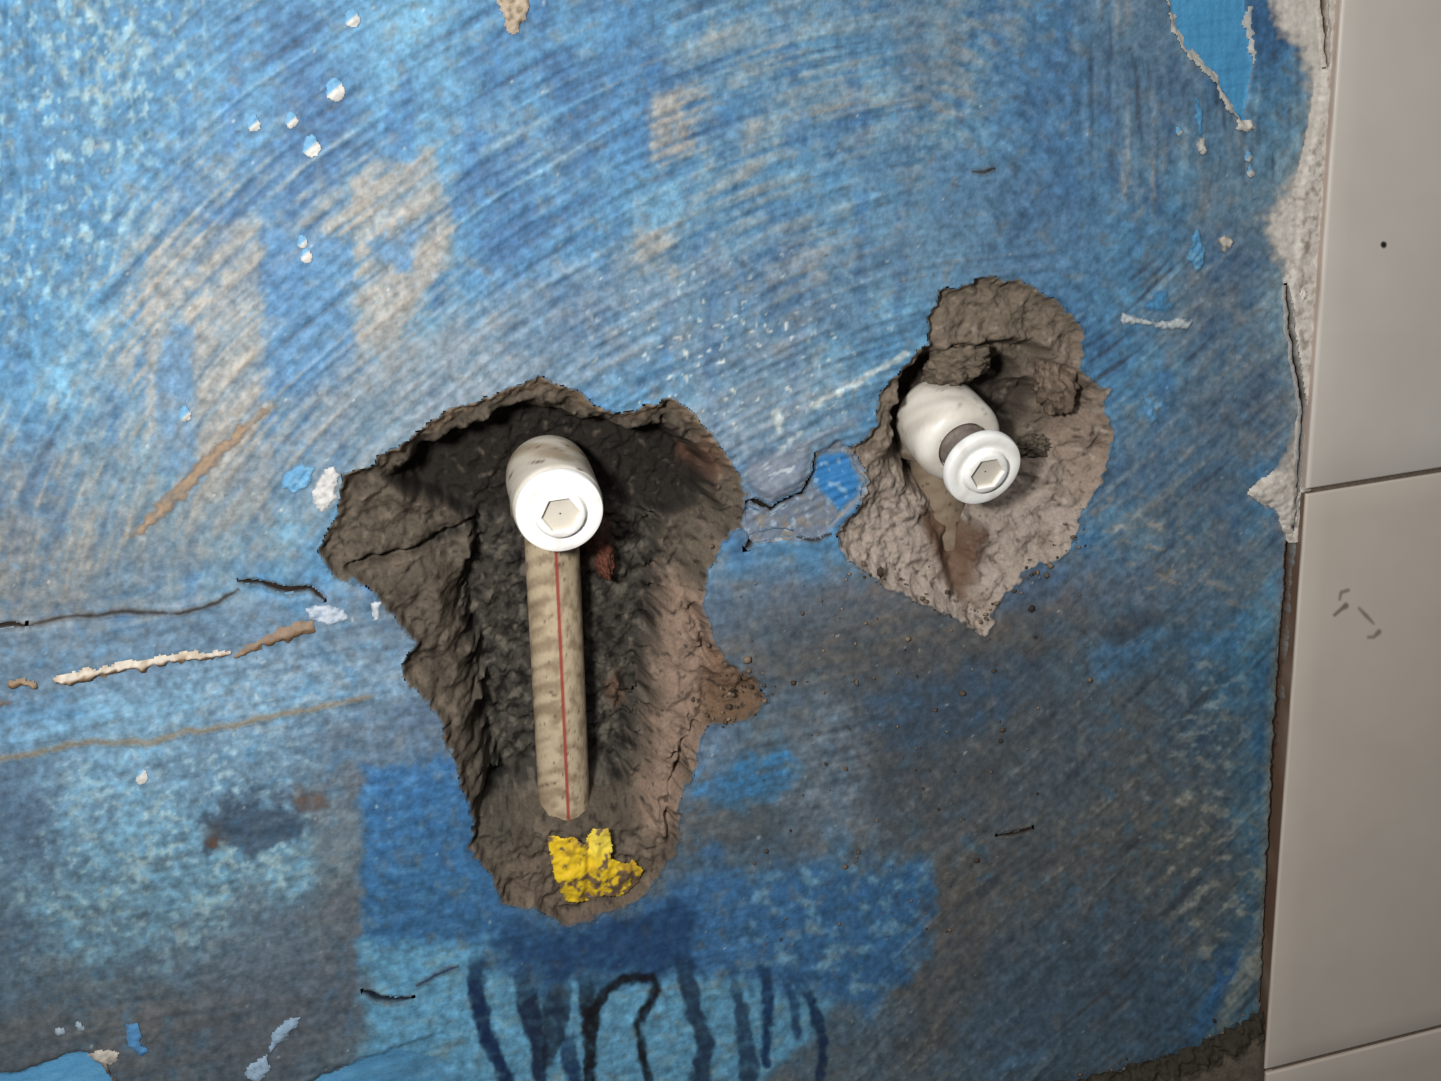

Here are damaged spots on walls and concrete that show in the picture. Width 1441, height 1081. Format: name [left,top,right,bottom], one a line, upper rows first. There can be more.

peeling [1166,0,1257,132]
peeling [1266,0,1336,405]
crack [742,456,832,551]
peeling [1248,420,1311,543]
crack [0,575,327,632]
spalling [282,274,1115,929]
peeling [0,1021,148,1081]
peeling [244,1017,300,1081]
water stain [467,970,513,1081]
water stain [517,973,661,1081]
water stain [678,969,715,1081]
water stain [733,978,828,1081]